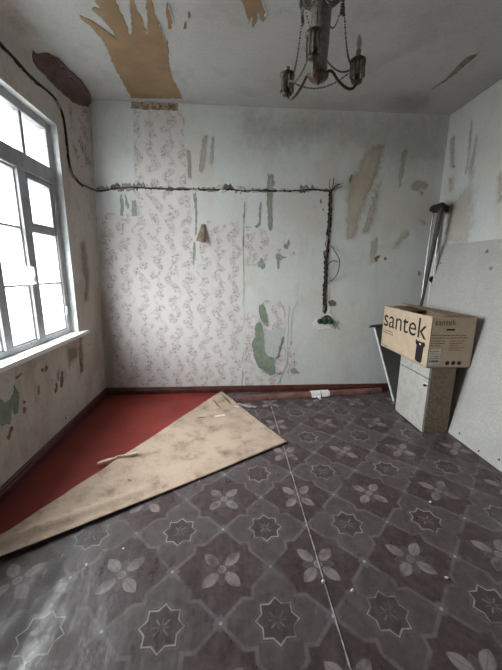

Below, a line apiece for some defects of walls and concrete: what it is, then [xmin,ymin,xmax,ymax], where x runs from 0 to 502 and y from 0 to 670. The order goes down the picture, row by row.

peeling [241,0,267,28]
peeling [80,0,183,100]
peeling [259,305,292,359]